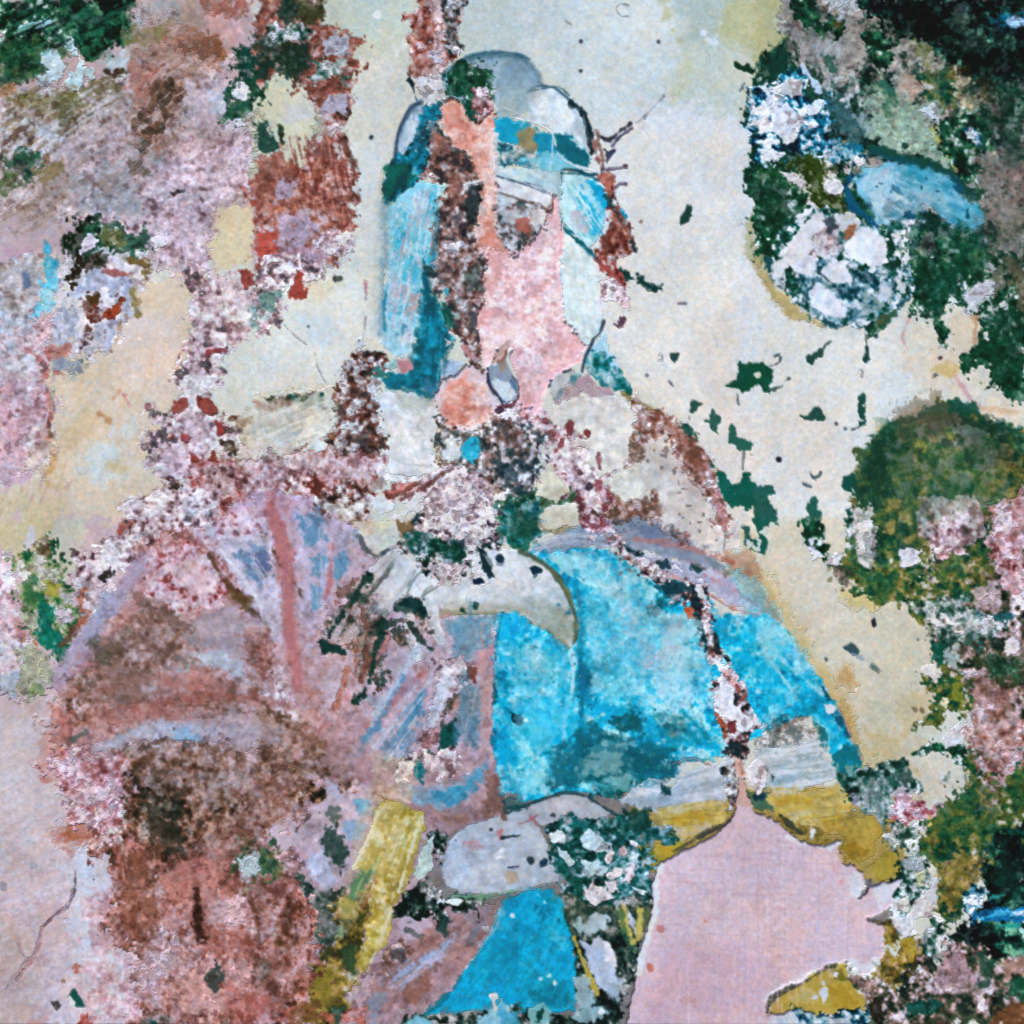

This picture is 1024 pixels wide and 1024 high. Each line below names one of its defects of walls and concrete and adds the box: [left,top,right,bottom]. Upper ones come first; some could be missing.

crack [6,876,77,990]